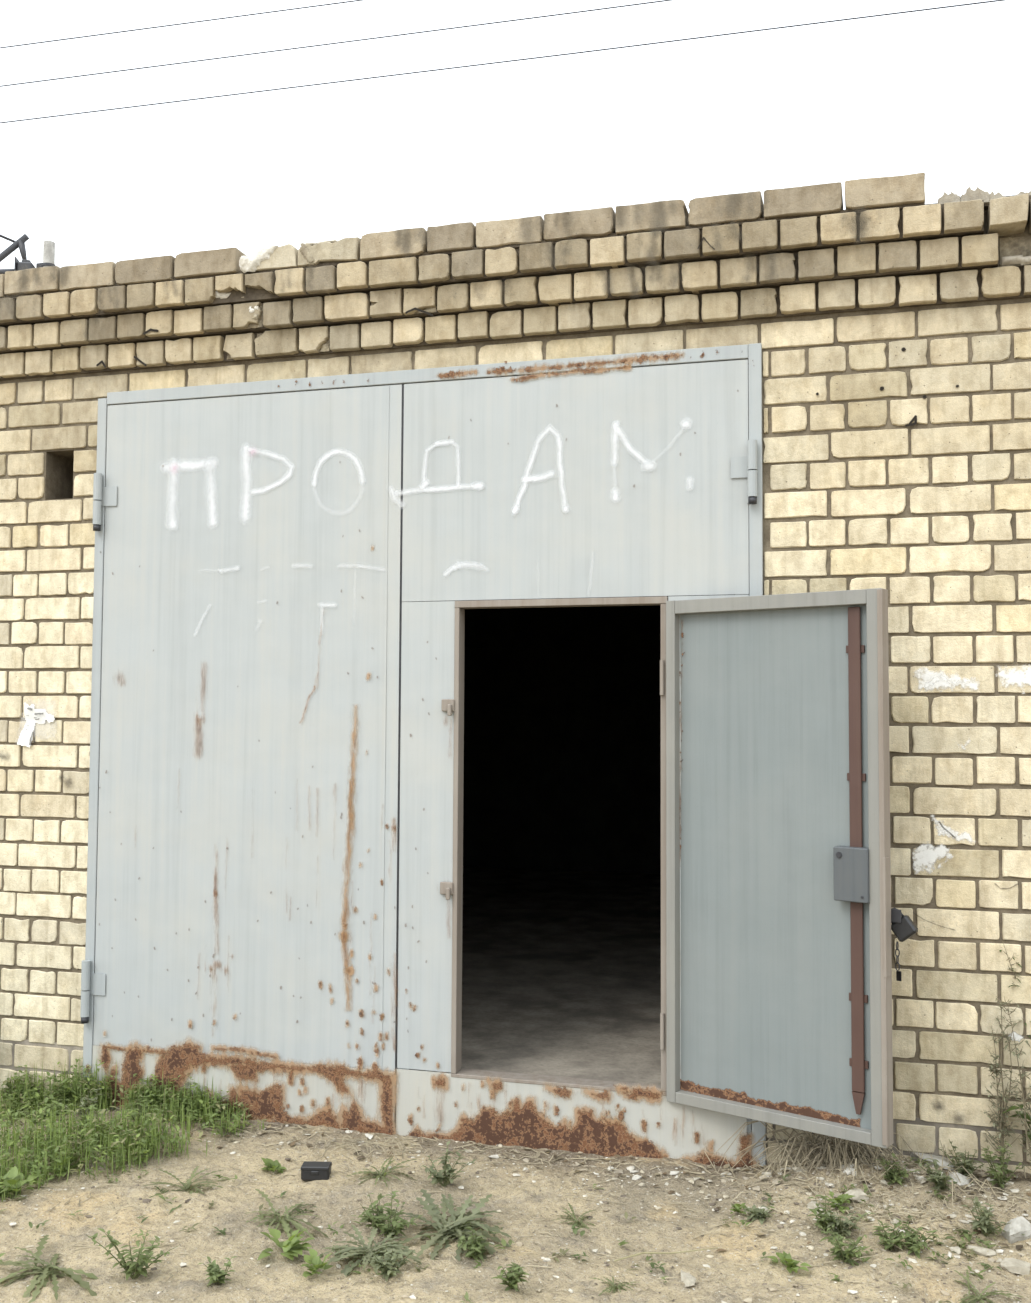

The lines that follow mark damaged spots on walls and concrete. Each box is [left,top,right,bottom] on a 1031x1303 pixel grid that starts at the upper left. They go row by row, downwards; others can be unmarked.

rust [438,350,718,382]
rust [86,707,760,1168]
rust [680,1079,860,1127]